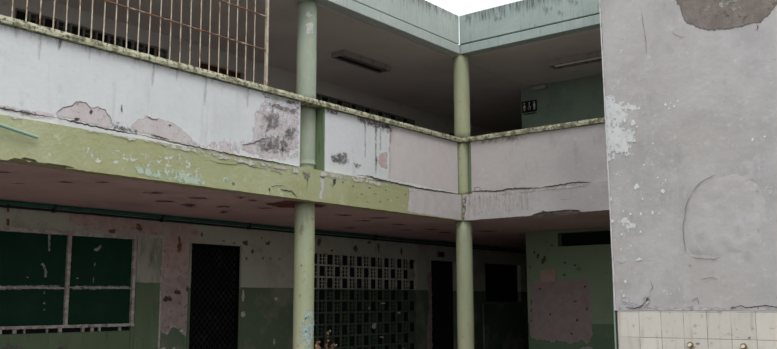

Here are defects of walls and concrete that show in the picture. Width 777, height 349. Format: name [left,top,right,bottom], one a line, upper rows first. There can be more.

spalling [677,0,777,31]
spalling [56,101,118,128]
peeling [80,142,205,185]
crack [0,107,299,197]
spalling [131,115,192,144]
peeling [203,95,300,161]
crack [320,172,591,195]
peeling [605,95,640,175]
peeling [611,210,660,250]
peeling [0,263,60,310]
peeling [69,210,203,336]
crack [622,283,653,308]